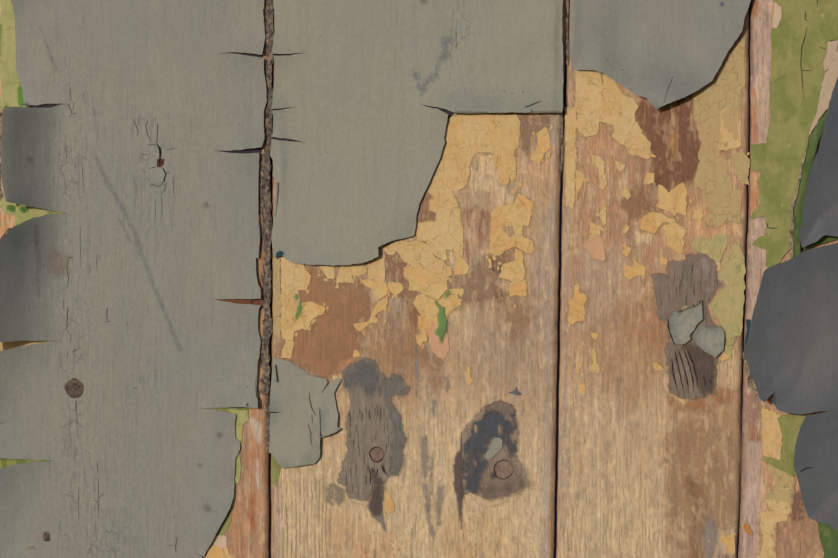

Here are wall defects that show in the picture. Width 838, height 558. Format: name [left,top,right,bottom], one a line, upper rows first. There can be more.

peeling [0,0,267,558]
peeling [381,491,394,515]
peeling [269,0,751,468]
peeling [720,533,737,558]
peeling [742,77,838,558]
peeling [823,40,838,72]